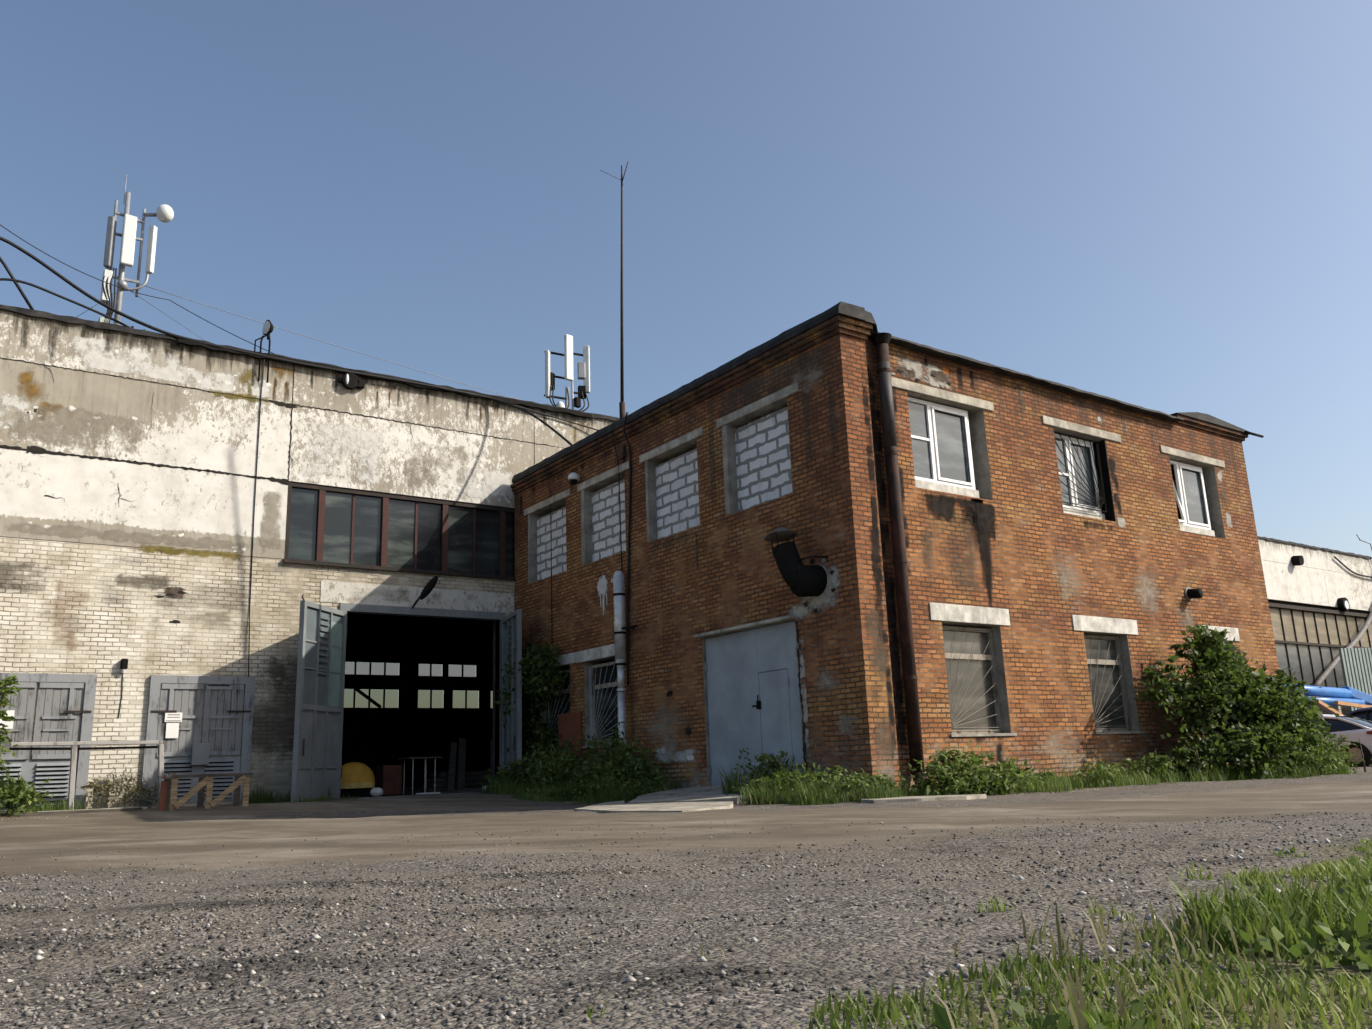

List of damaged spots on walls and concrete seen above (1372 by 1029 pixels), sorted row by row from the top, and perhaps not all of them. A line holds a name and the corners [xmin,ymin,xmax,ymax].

water stain [23,320,215,365]
peeling [74,337,297,408]
spalling [891,356,951,389]
peeling [0,394,137,457]
water stain [119,575,167,588]
spalling [789,558,840,620]
water stain [863,367,909,752]
water stain [926,494,996,607]